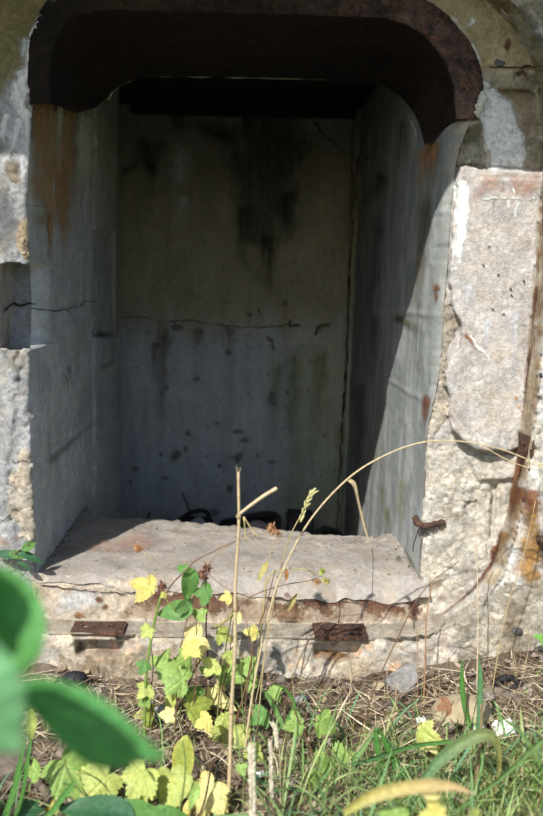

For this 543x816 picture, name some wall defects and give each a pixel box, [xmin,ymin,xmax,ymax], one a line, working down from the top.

crack [5,301,93,313]
spalling [427,287,460,435]
spalling [420,446,495,593]
rust [510,446,543,582]
spalling [533,417,543,521]
rust [266,591,347,622]
rust [357,600,422,618]